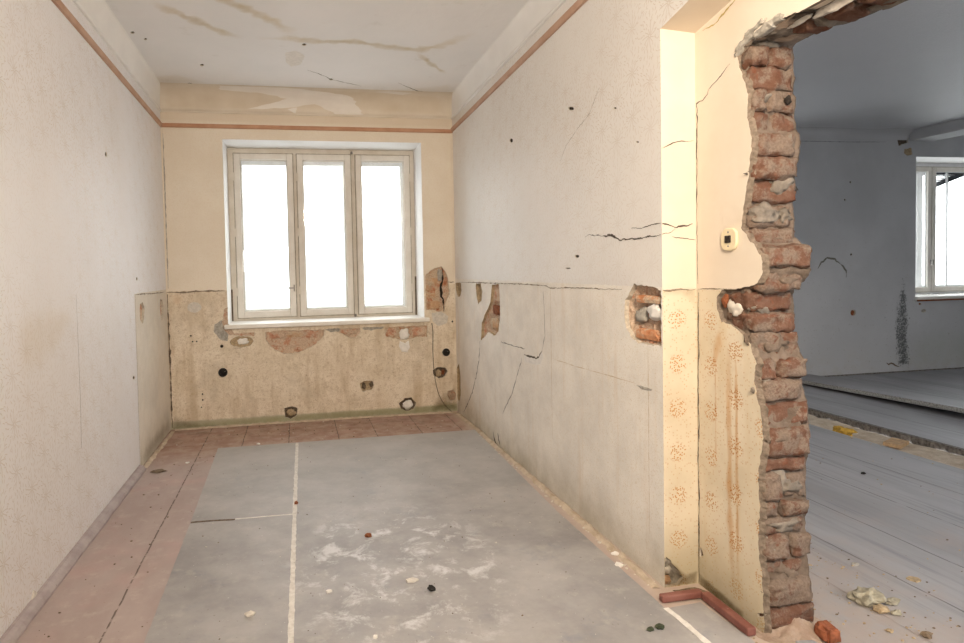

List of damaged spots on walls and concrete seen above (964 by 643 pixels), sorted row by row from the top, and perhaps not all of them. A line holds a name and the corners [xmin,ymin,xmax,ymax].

flaking render [792,0,897,35]
spalling [222,307,428,354]
spalling [425,267,462,312]
spalling [476,283,500,340]
crack [502,296,545,412]
spalling [624,284,662,346]
flaking render [721,45,814,629]
crack [813,252,852,278]
damp [895,284,910,366]